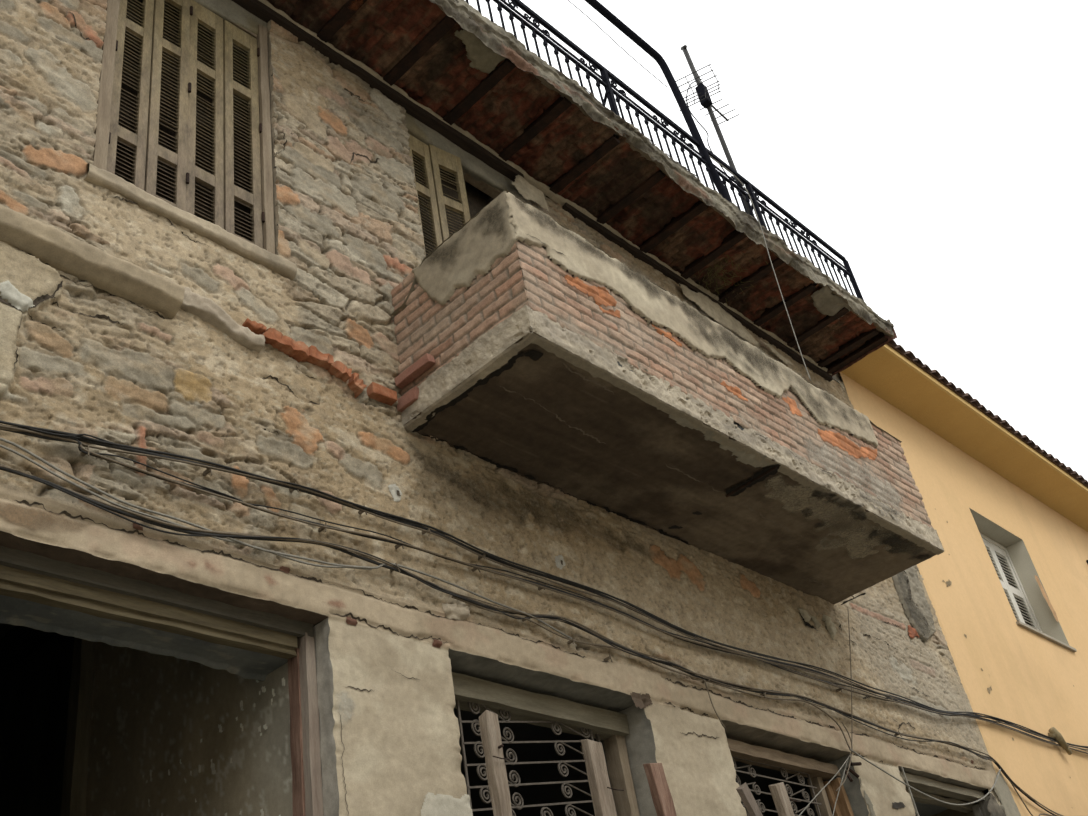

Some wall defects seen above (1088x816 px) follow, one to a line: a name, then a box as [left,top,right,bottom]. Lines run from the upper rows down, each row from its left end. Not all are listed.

peeling [455,17,508,74]
peeling [512,175,549,211]
crack [0,242,170,365]
leakage [622,265,777,374]
peeling [679,283,793,365]
spalling [412,350,543,432]
crack [0,497,609,662]
leakage [812,491,866,519]
leakage [869,530,930,559]
crack [339,686,375,814]
crack [666,678,987,771]
peeling [421,792,473,816]